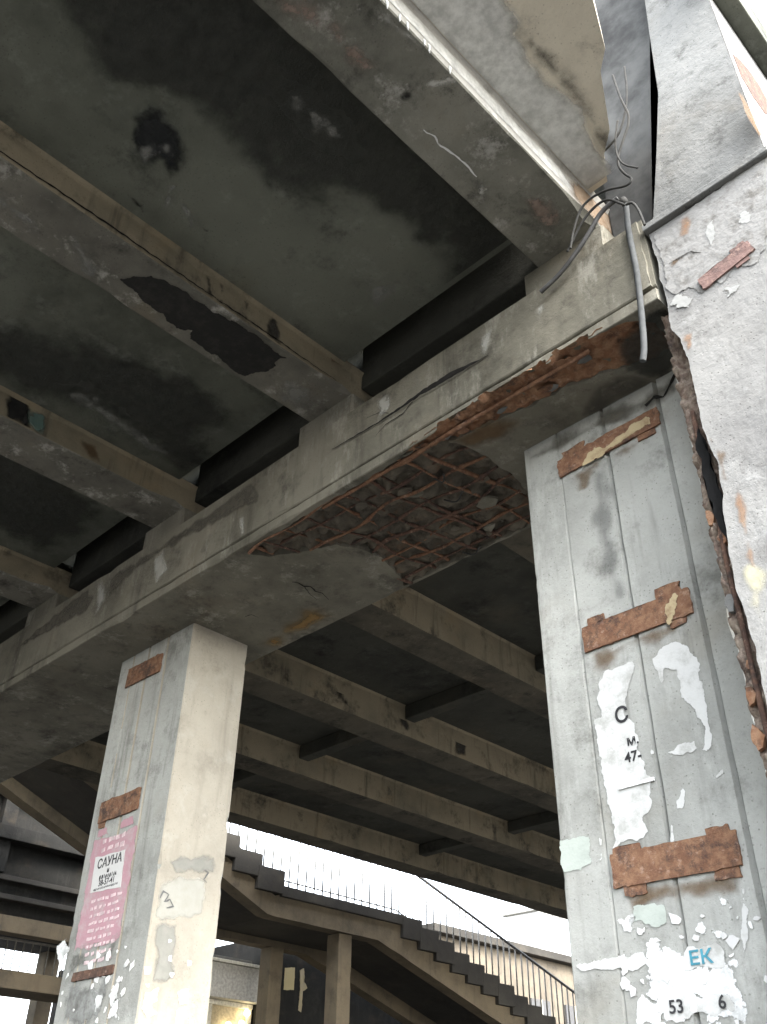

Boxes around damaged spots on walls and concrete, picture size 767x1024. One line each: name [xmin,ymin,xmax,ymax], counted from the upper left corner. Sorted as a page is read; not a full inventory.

spalling [120,276,286,376]
crack [333,355,488,449]
corrosion [597,384,674,425]
spalling [247,321,639,584]
corrosion [551,437,575,449]
peeling [582,417,650,466]
peeling [654,157,767,778]
corrosion [597,652,612,664]
corrosion [634,888,669,905]
corrosion [684,879,733,894]